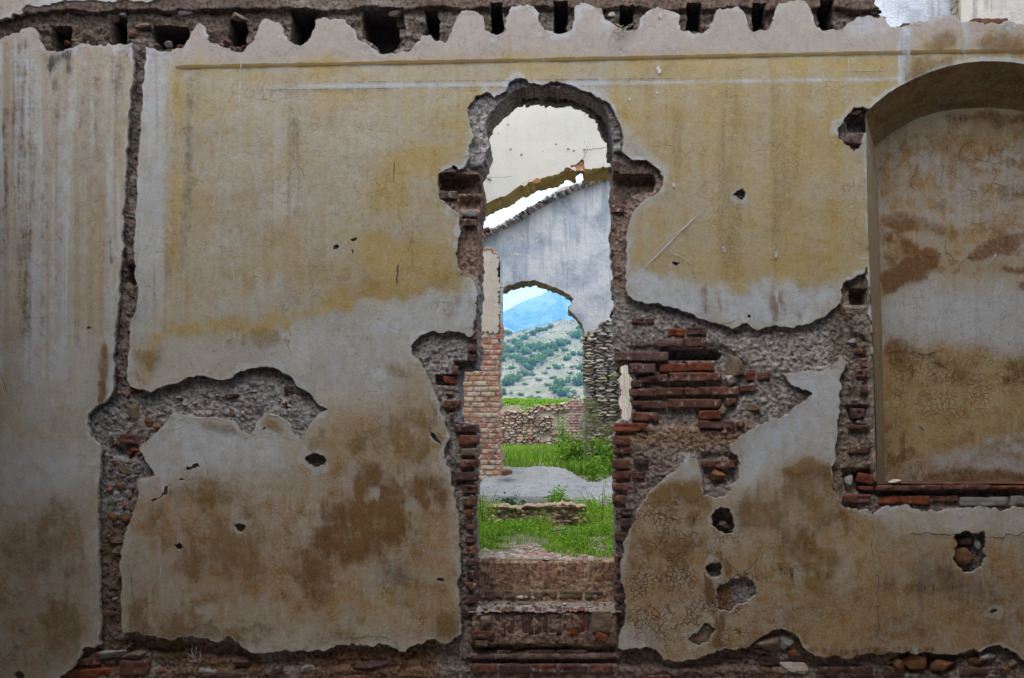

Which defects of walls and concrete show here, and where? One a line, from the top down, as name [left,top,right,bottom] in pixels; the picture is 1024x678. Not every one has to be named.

damp [47,49,71,89]
spalling [0,0,886,54]
crack [837,60,1021,158]
crack [910,142,1005,224]
crack [0,0,610,678]
spalling [61,79,611,678]
crack [165,78,873,654]
spalling [533,83,1024,678]
damp [298,463,446,604]
damp [737,456,845,592]
crack [618,355,1024,662]
damp [915,467,1024,481]